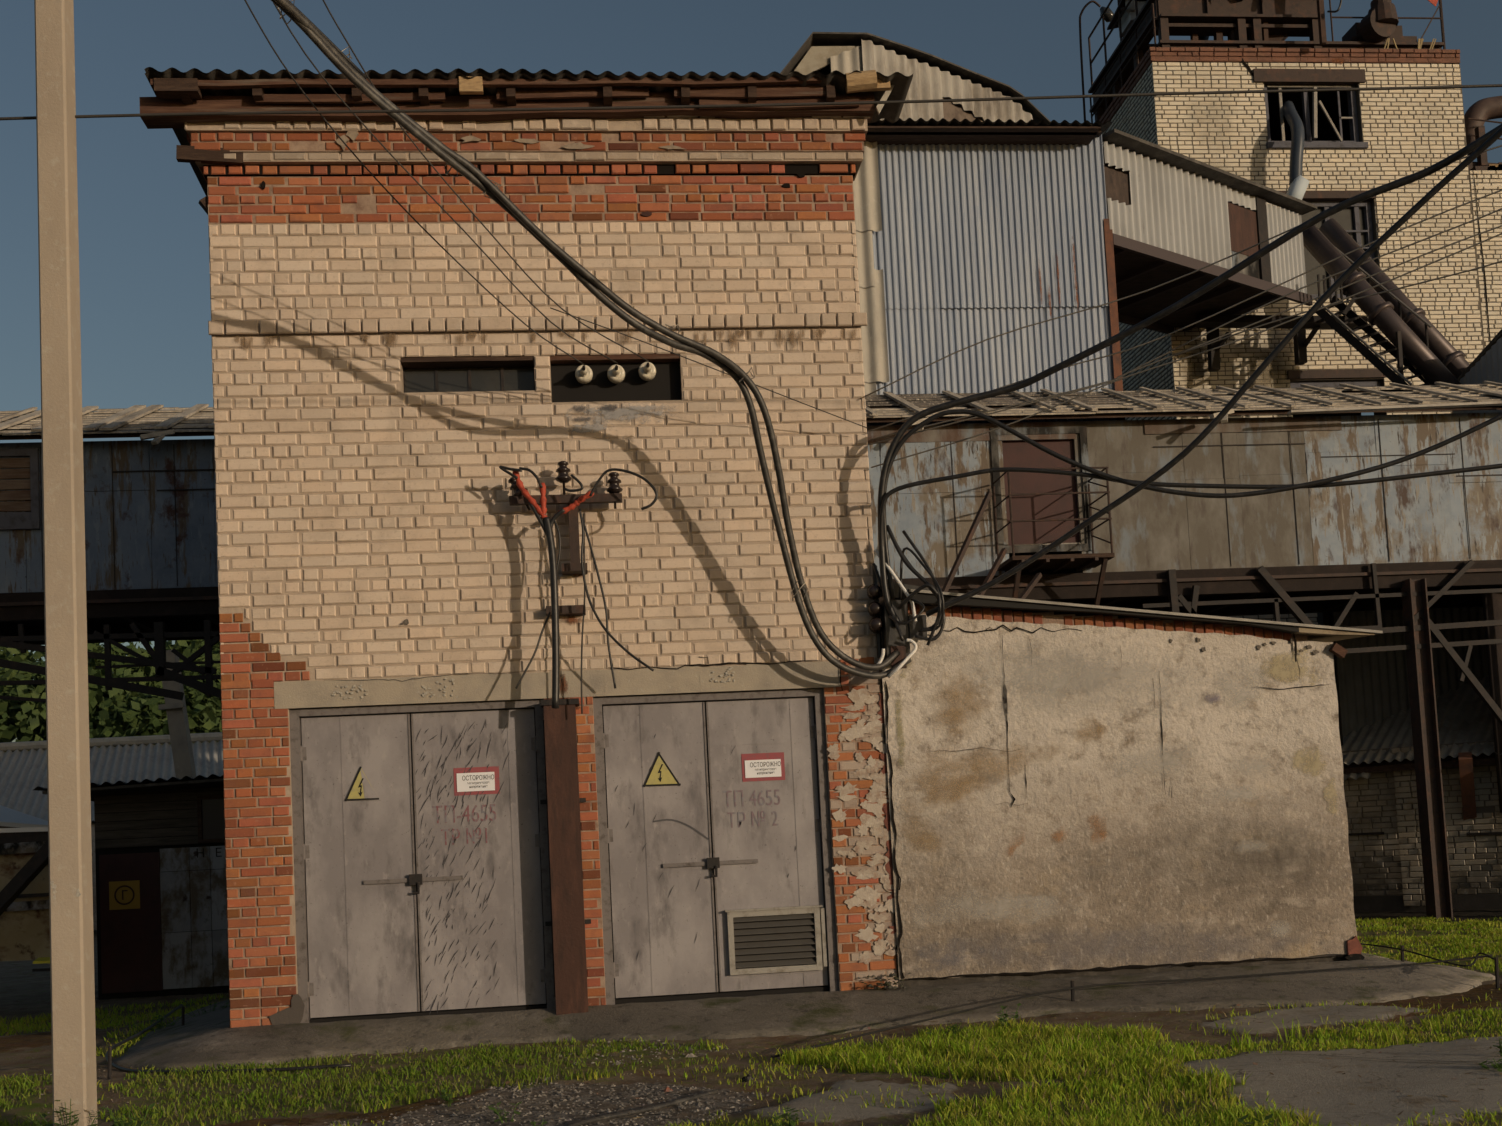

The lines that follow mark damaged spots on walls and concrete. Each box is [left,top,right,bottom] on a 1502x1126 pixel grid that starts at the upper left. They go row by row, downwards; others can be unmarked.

corrosion [1039,245,1079,316]
crack [608,657,843,691]
crack [927,624,1082,806]
crack [1259,633,1329,690]
peeling [827,688,897,964]
crack [885,671,1342,980]